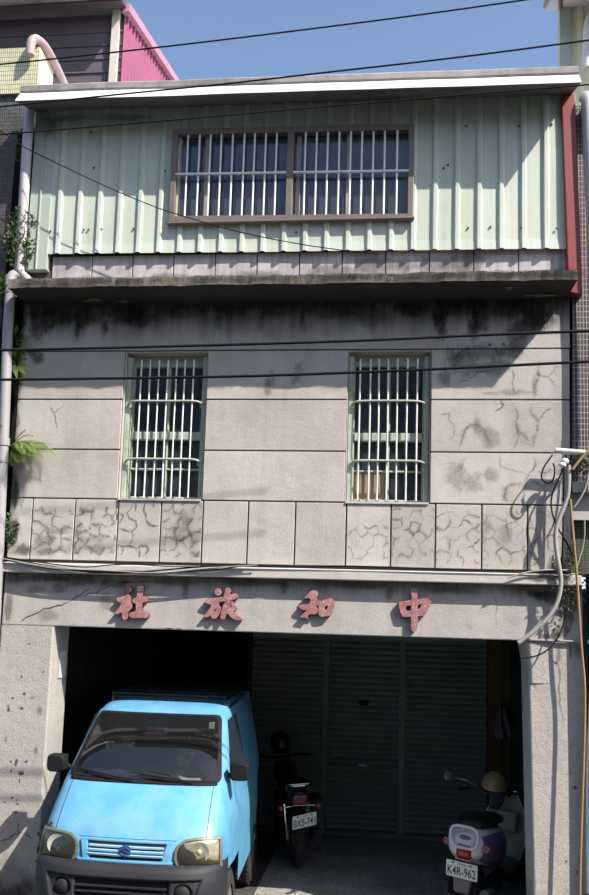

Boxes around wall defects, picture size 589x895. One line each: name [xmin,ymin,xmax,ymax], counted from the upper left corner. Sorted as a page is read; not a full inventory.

damp [433,299,552,336]
crack [119,502,157,558]
crack [23,581,150,620]